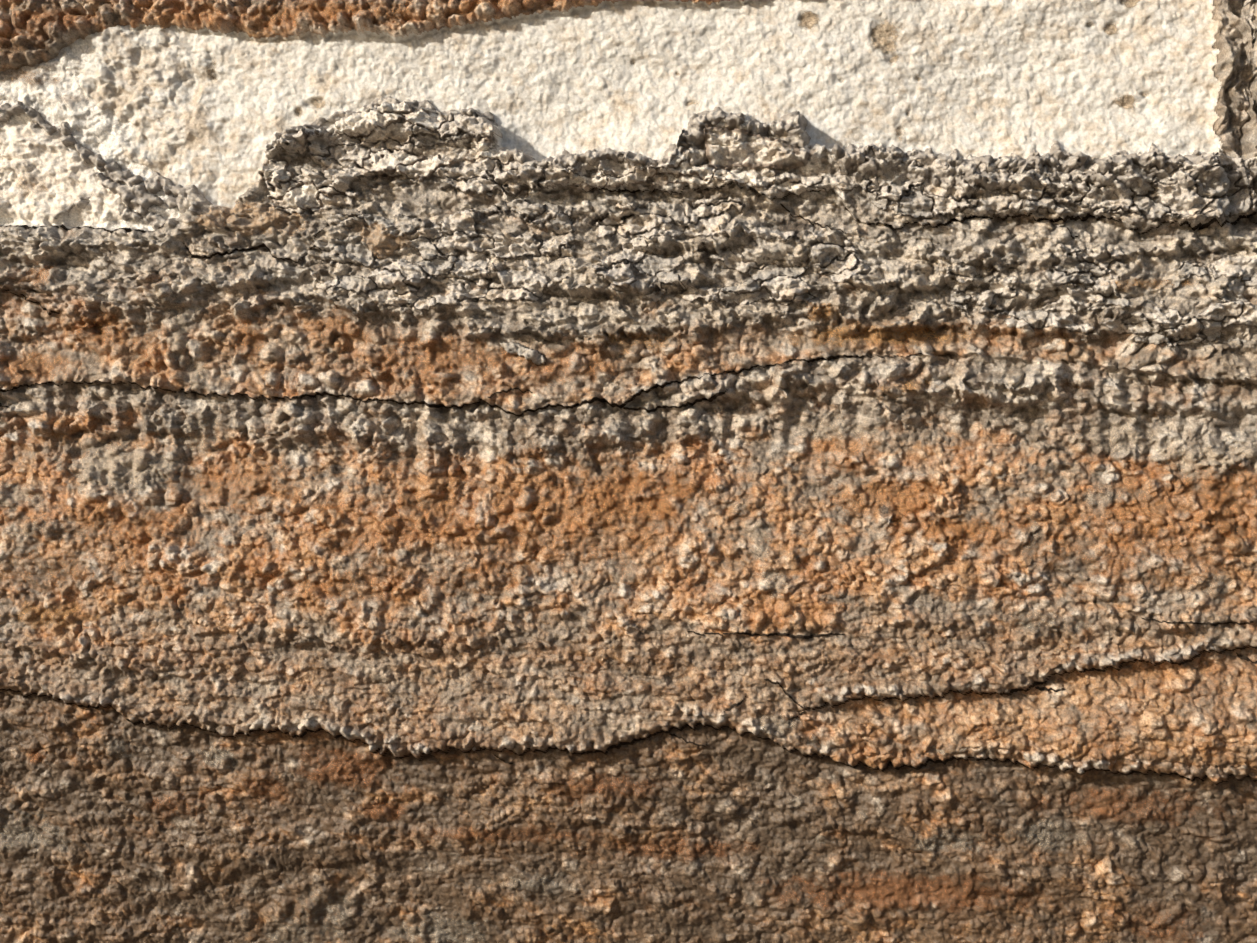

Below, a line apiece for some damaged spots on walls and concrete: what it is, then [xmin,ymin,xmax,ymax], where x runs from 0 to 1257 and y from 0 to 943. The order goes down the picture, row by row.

spalling [0,0,1257,318]
crack [0,353,922,416]
crack [0,618,1257,785]